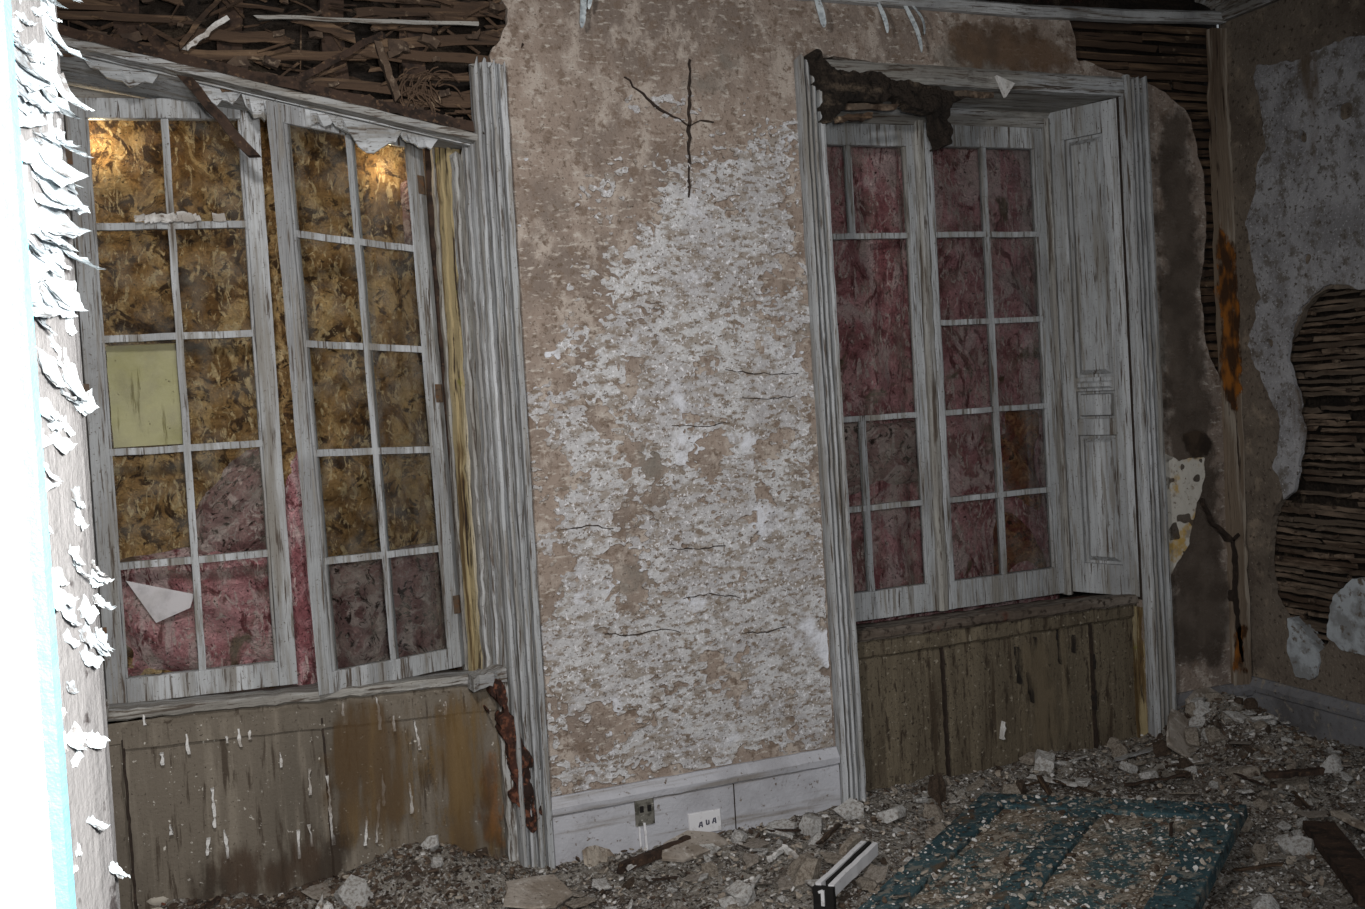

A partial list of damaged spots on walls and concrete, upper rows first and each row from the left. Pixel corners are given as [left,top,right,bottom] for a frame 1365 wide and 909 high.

crack [624,59,714,198]
flaking render [804,49,1015,152]
flaking render [12,0,506,530]
corrosion [1214,228,1243,410]
flaking render [1245,35,1365,680]
peeling [1165,454,1205,575]
peeling [52,545,117,669]
corrosion [1233,624,1248,673]
peeling [62,708,110,767]
peeling [73,842,82,873]
peeling [86,815,110,831]
peeling [109,861,130,879]